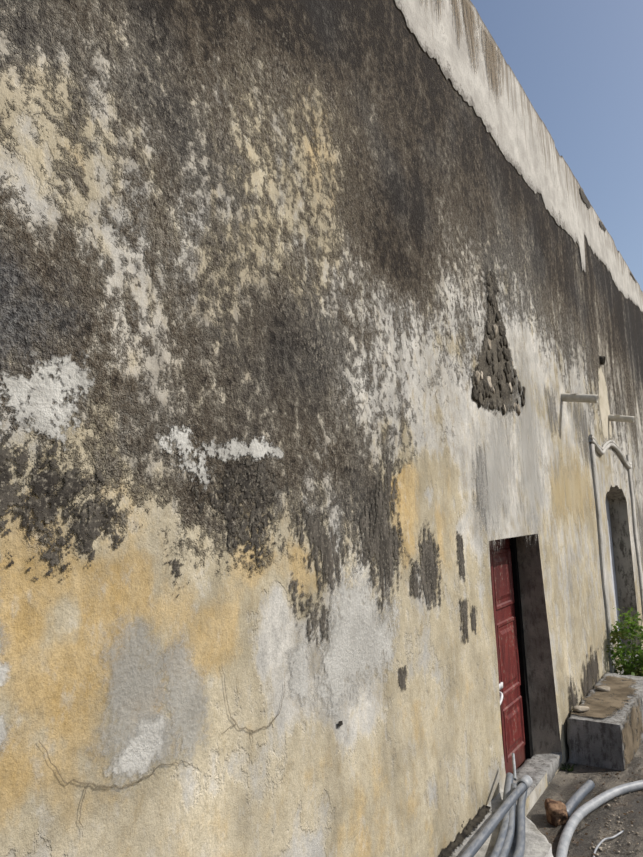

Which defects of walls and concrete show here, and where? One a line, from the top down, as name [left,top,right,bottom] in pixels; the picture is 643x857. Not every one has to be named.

spalling [471,268,527,416]
water stain [544,385,559,436]
water stain [573,403,591,465]
water stain [598,365,612,441]
water stain [0,414,125,585]
water stain [473,446,492,530]
water stain [165,529,190,598]
water stain [186,444,444,647]
water stain [456,531,466,581]
water stain [460,599,477,644]
crack [222,670,285,746]
crack [39,740,193,837]